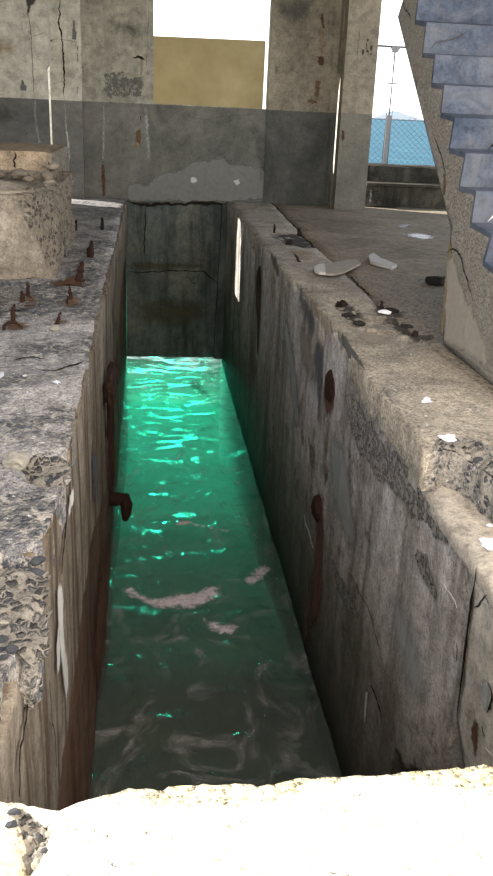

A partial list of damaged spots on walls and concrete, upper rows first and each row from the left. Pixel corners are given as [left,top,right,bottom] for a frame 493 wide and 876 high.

crack [28,4,77,100]
corrosion [51,276,85,306]
spalling [2,451,73,488]
spalling [432,434,493,479]
corrosion [304,499,323,635]
spalling [0,556,53,677]
crack [455,568,491,714]
crack [19,704,28,797]